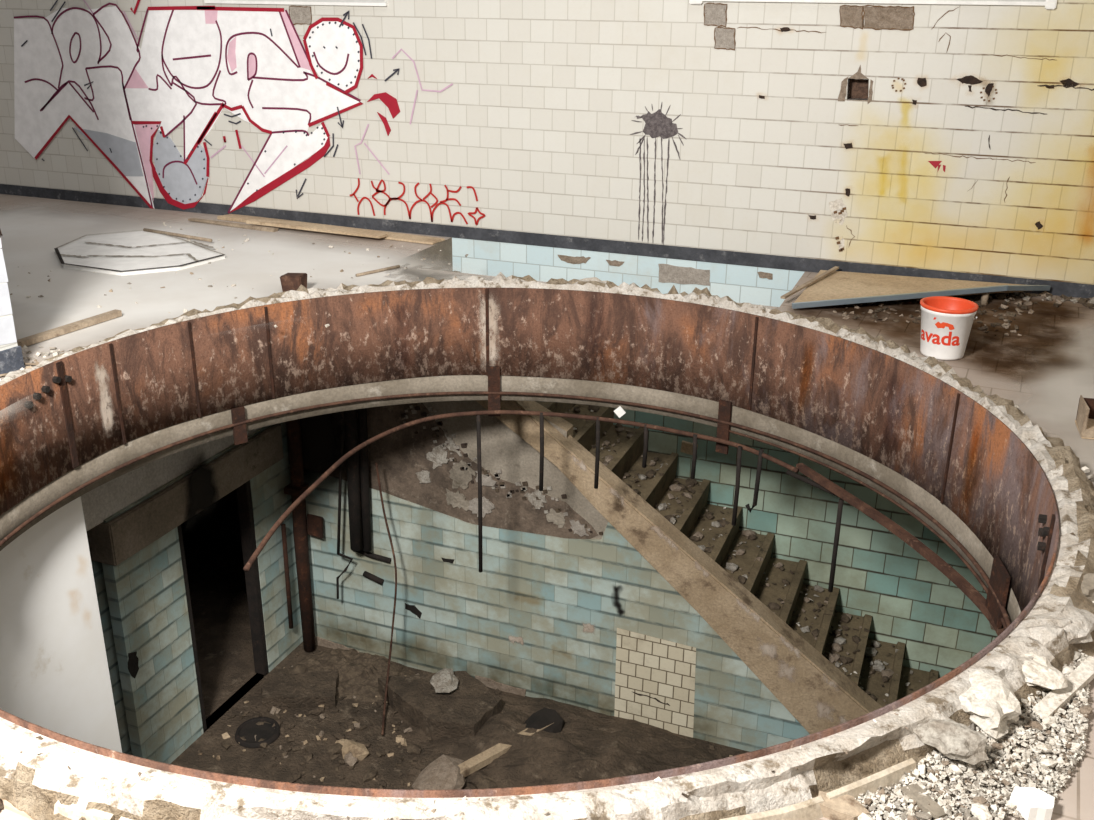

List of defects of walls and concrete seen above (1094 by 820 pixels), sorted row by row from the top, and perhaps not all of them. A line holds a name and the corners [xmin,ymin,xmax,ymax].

peeling [704,3,736,51]
peeling [839,5,915,31]
spalling [838,65,873,104]
peeling [658,264,710,286]
corrosion [96,366,112,429]
spalling [81,400,810,790]